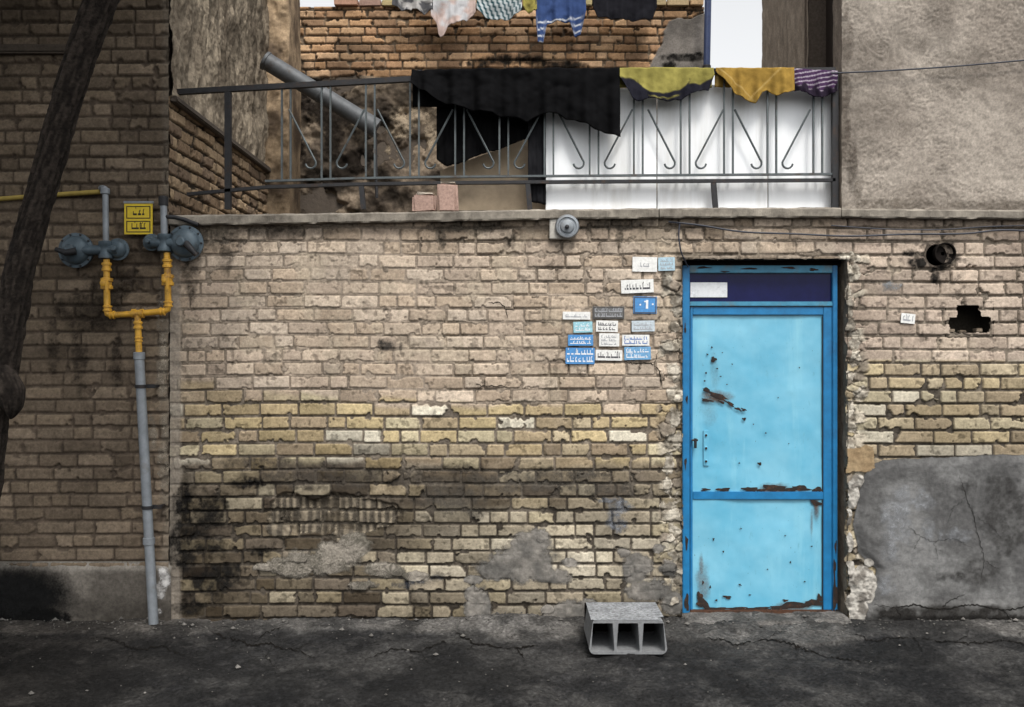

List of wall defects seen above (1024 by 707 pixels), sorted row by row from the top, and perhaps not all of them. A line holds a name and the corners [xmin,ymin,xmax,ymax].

damp [157,289,167,399]
spalling [945,305,994,337]
damp [148,416,240,615]
peeling [253,563,273,572]
damp [231,456,377,489]
spalling [266,492,397,542]
peeling [561,558,579,567]
flaking render [652,271,689,611]
rust [701,485,822,525]
rust [696,540,838,611]
flaking render [838,251,878,620]
crack [908,477,1000,578]